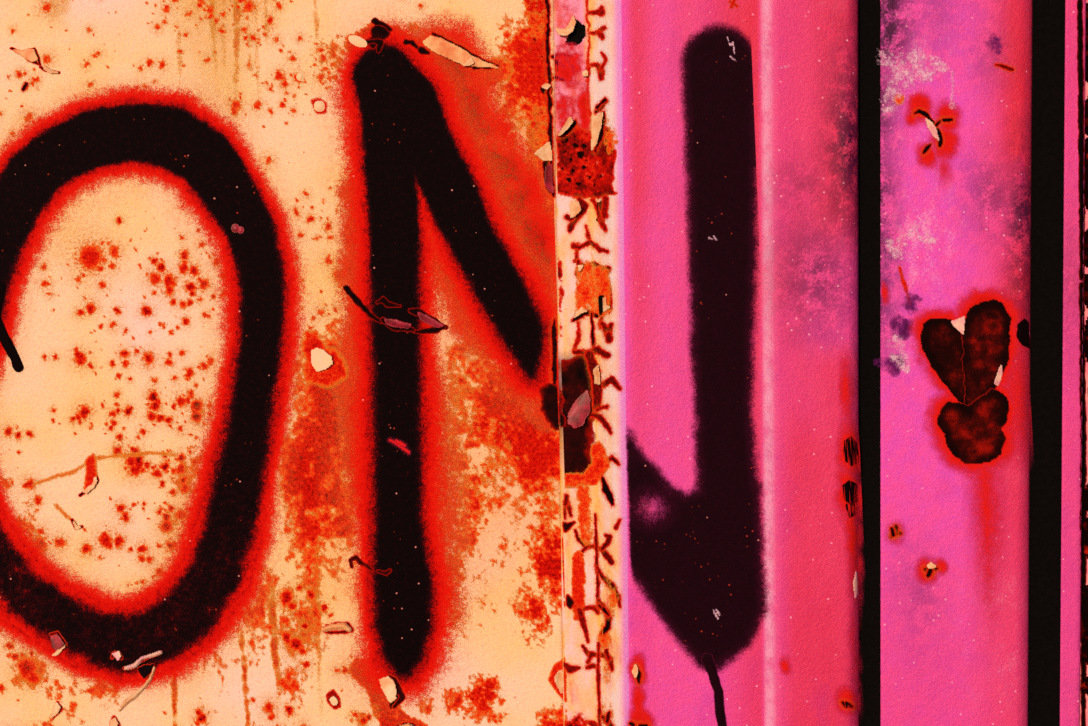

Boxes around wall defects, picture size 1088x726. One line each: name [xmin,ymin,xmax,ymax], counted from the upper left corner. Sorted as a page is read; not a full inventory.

peeling [423,31,500,70]
corrosion [482,0,618,232]
corrosion [893,93,960,178]
corrosion [0,228,226,593]
corrosion [203,290,359,726]
peeling [311,348,333,372]
peeling [384,312,444,329]
corrosion [439,338,610,650]
peeling [539,365,600,431]
corrosion [555,248,611,358]
corrosion [912,289,1031,594]
corrosion [334,655,507,726]